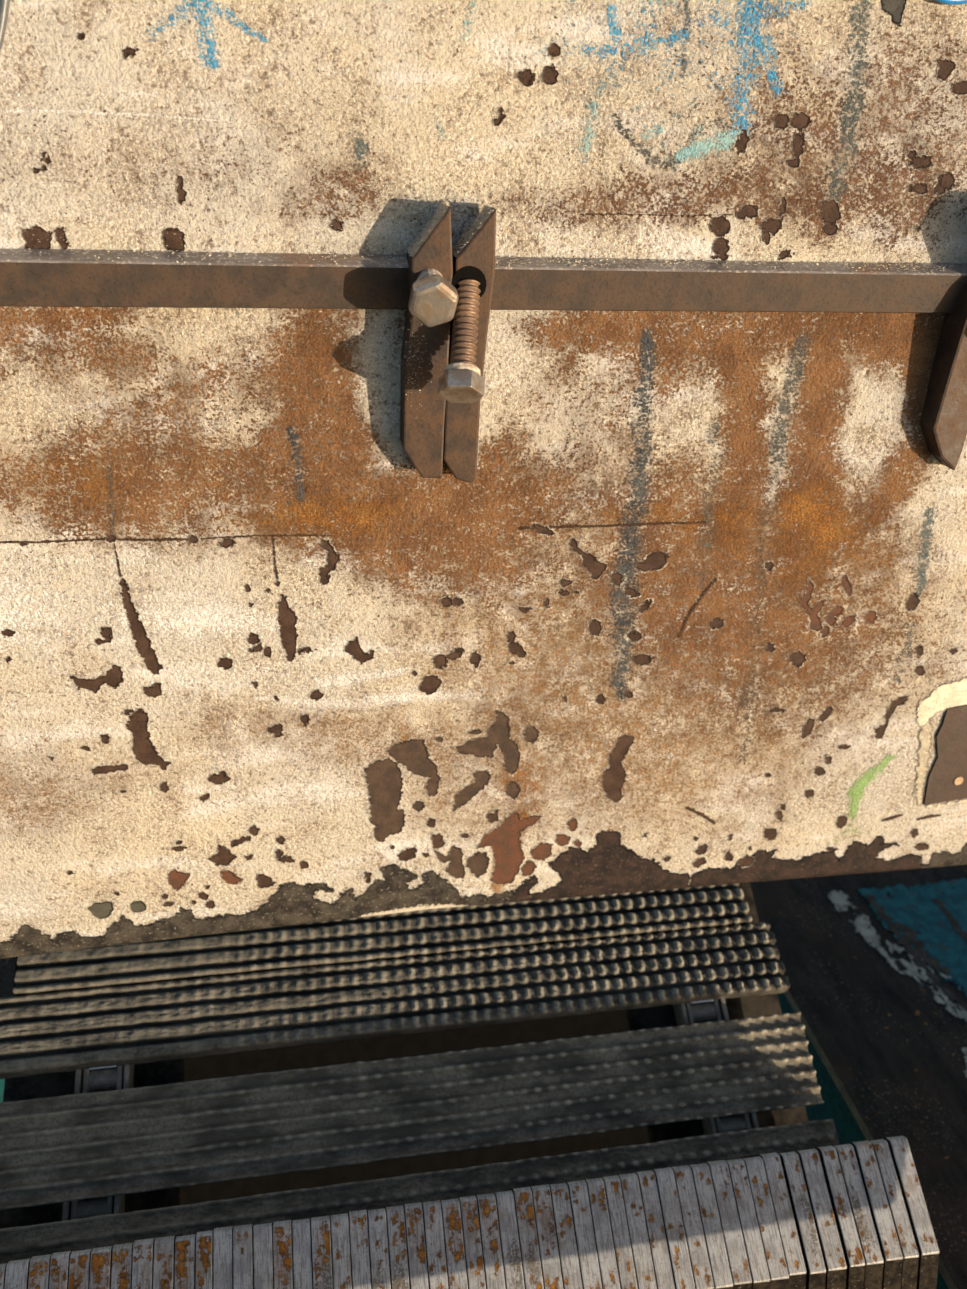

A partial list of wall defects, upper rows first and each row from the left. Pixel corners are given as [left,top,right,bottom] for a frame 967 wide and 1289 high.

peeling [774,112,813,168]
peeling [20,224,71,250]
peeling [162,227,186,252]
crack [580,211,733,219]
peeling [708,196,796,261]
crack [518,521,707,530]
rust [0,306,967,893]
peeling [800,575,878,639]
peeling [70,665,124,694]
peeling [91,577,171,793]
peeling [875,695,910,739]
peeling [0,706,967,1022]